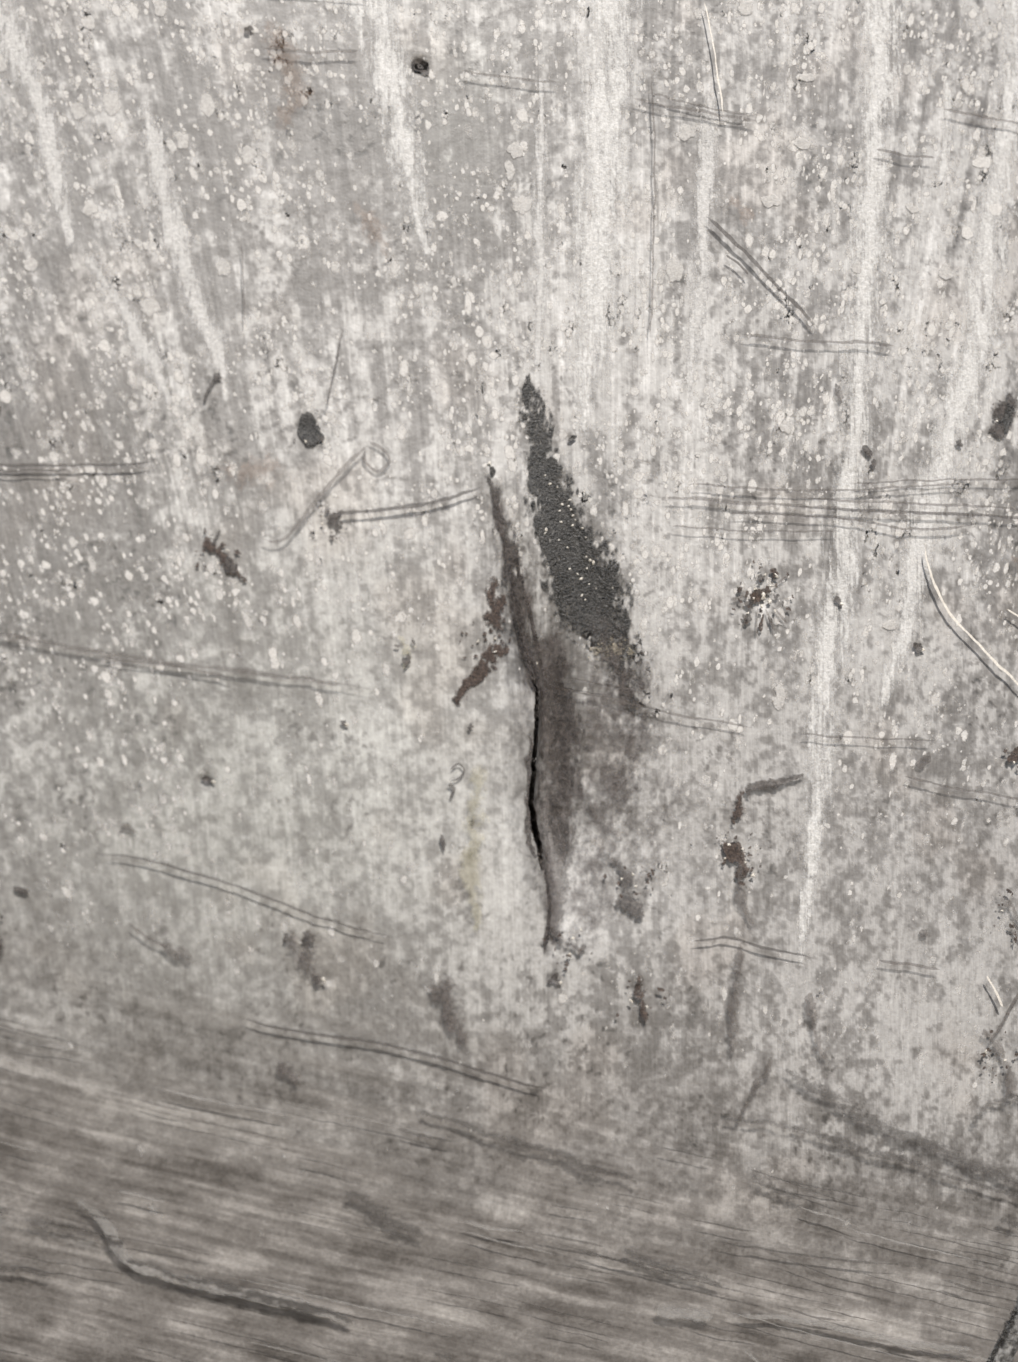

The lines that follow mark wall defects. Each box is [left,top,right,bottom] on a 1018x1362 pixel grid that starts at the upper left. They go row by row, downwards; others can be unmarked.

leakage [569,0,643,431]
crack [488,461,551,952]
leakage [487,77,650,861]